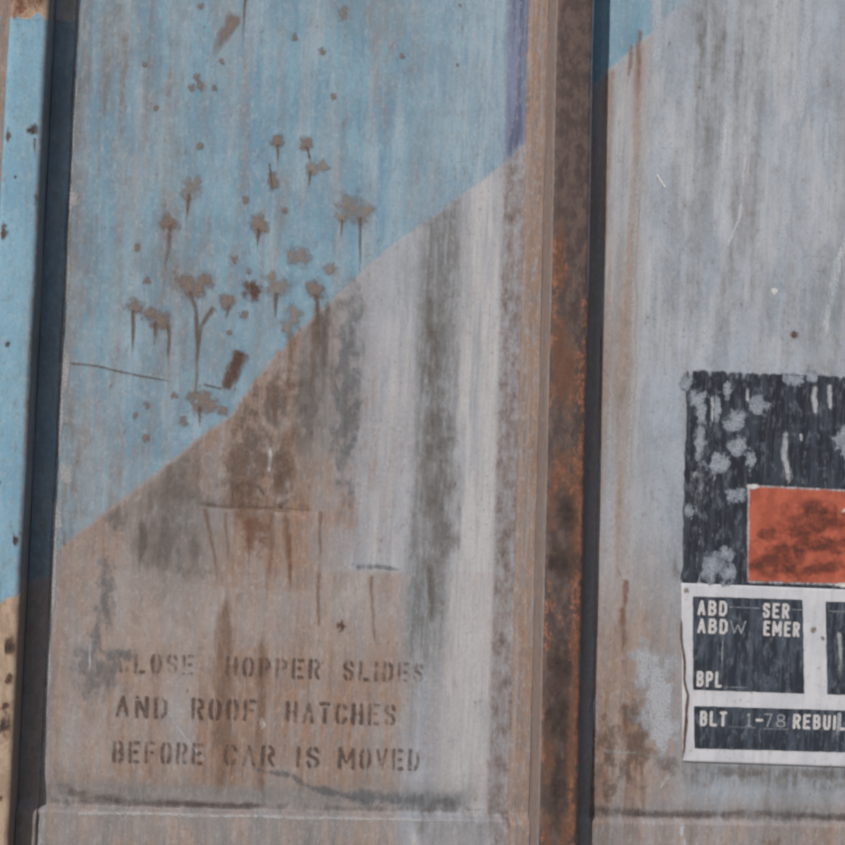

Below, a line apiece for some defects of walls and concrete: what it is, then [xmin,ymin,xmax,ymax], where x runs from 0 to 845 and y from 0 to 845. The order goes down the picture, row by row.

rust [300,138,328,182]
rust [243,270,286,313]
rust [127,299,170,355]
rust [179,274,234,359]
rust [222,350,245,389]
peeling [782,369,821,387]
peeling [679,376,770,475]
peeling [831,425,845,459]
peeling [725,484,760,505]
peeling [701,545,737,587]
rust [4,639,14,653]
rust [543,641,578,845]